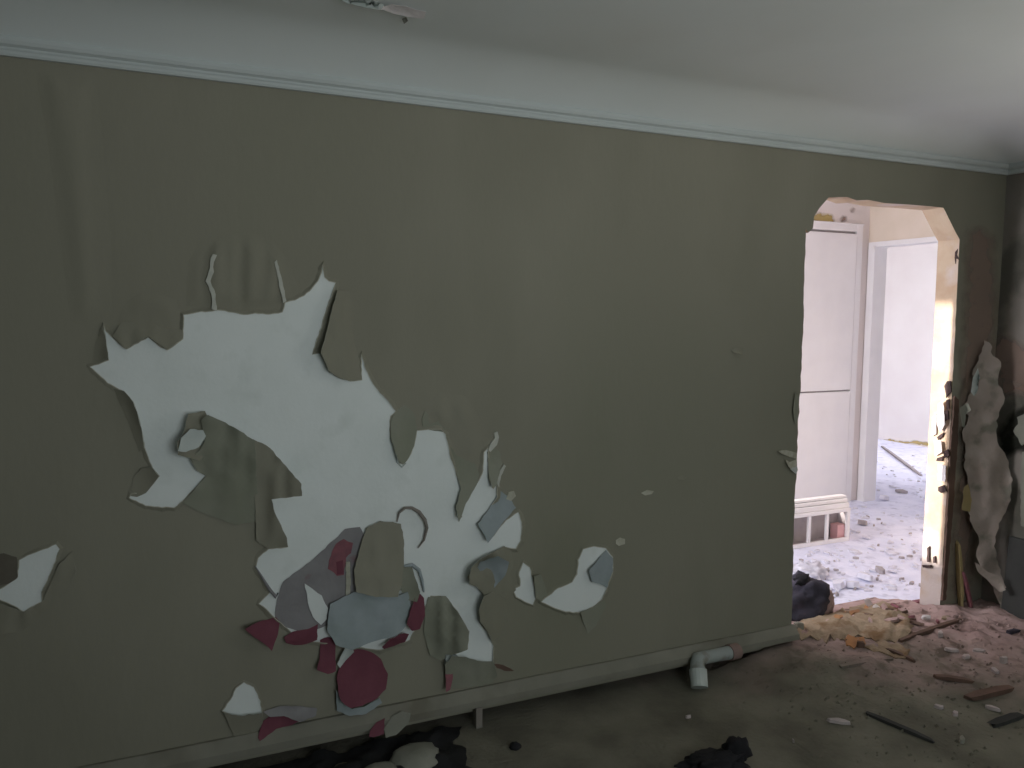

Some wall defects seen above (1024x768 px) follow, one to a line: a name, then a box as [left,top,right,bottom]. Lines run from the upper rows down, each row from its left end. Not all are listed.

peeling [0,541,76,634]
peeling [220,680,317,741]
peeling [86,254,625,716]
peeling [922,340,1024,608]